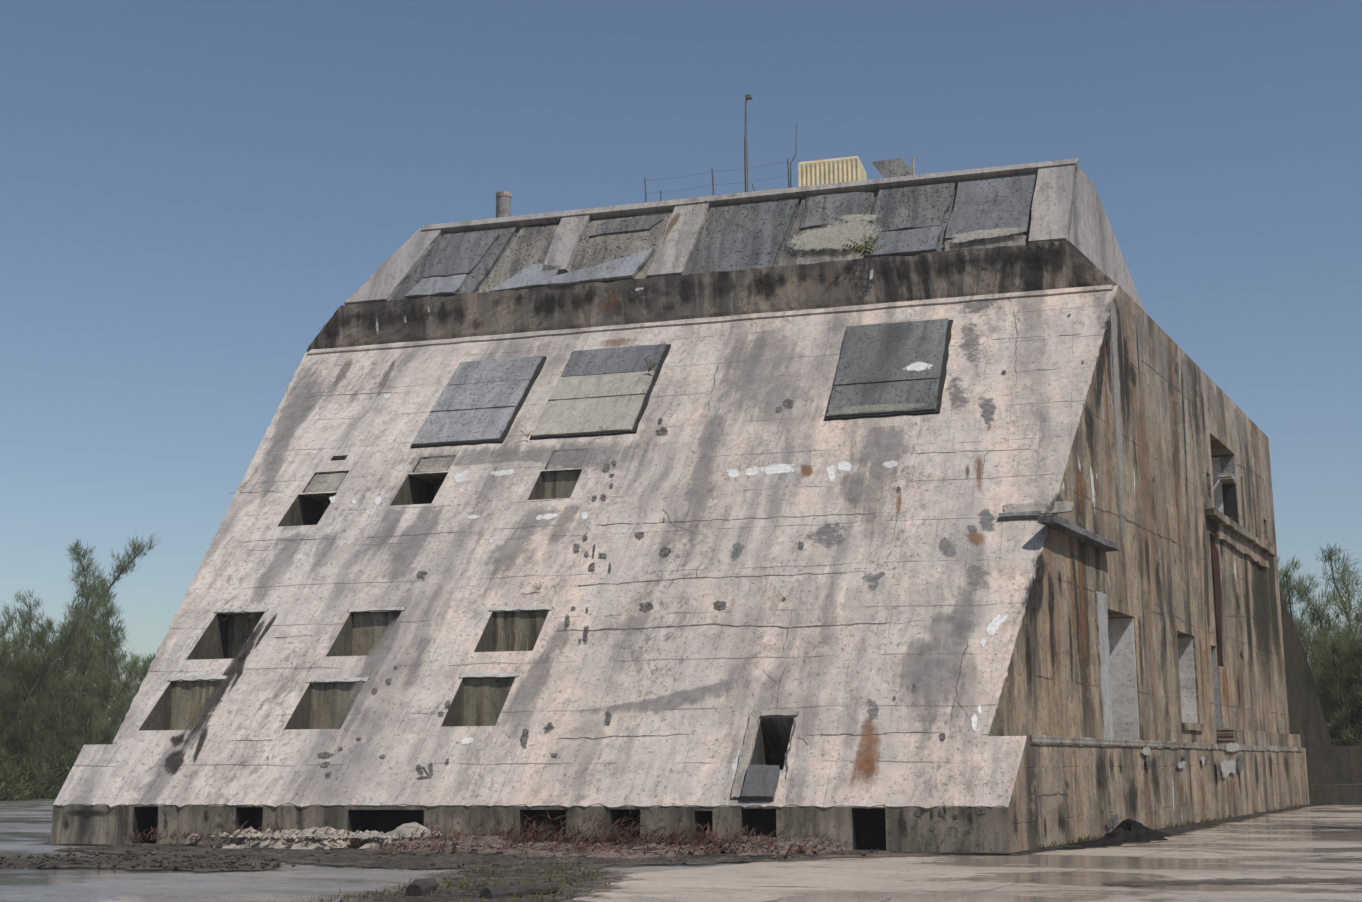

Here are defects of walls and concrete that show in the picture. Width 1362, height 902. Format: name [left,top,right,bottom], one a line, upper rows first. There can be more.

leakage [663,264,854,310]
leakage [324,302,480,336]
leakage [960,300,994,361]
leakage [1085,297,1140,529]
spalling [581,460,616,519]
peeling [726,464,796,478]
peeling [827,461,852,481]
leakage [1078,461,1097,512]
spalling [573,535,611,573]
leakage [1025,554,1080,694]
corrosion [855,720,879,775]
peeling [1178,743,1244,781]